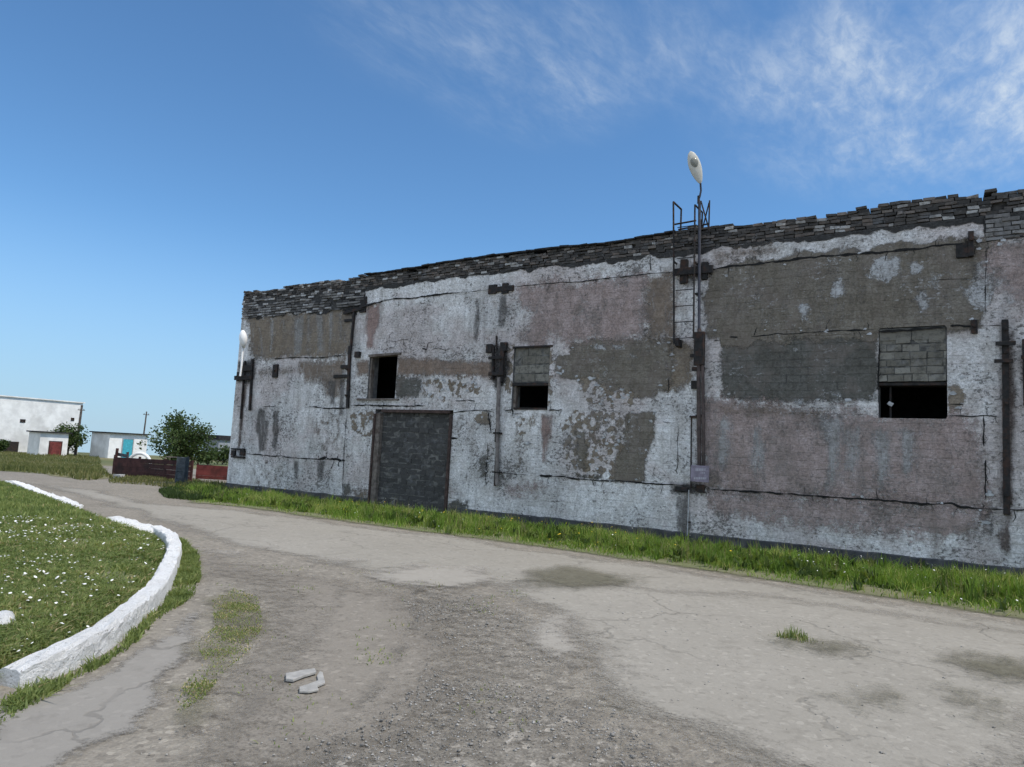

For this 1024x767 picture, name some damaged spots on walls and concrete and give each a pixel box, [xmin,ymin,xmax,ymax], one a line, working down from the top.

flaking render [241,211,1024,406]
crack [713,236,1024,403]
leakage [256,409,278,450]
leakage [260,357,369,478]
crack [246,403,425,495]
crack [451,400,680,491]
flaking render [548,336,675,484]
crack [712,404,1024,521]
spalling [947,376,966,414]